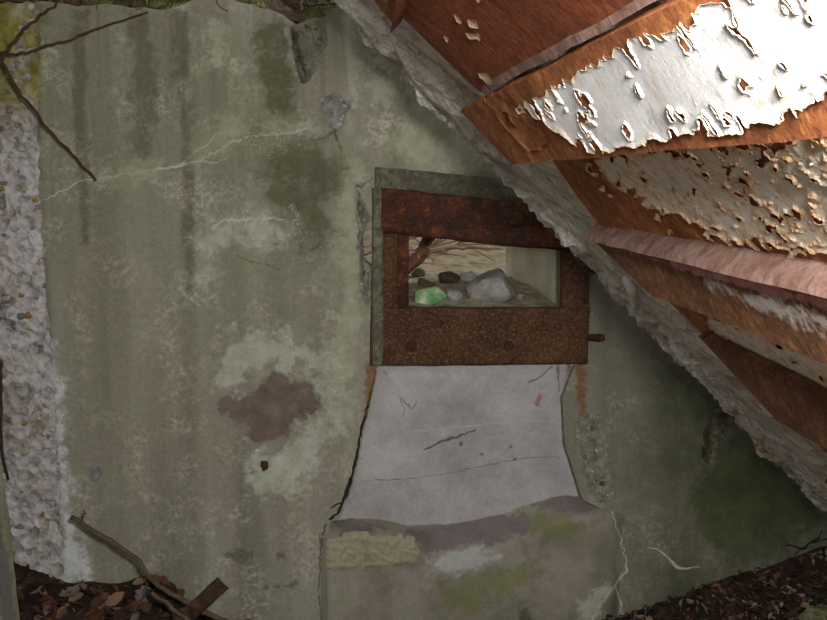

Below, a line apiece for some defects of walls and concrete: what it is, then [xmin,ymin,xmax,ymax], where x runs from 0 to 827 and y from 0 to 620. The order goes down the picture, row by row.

peeling [478,0,827,259]
spalling [0,2,64,581]
crack [318,371,561,618]
spalling [704,404,735,464]
peeling [706,316,827,389]